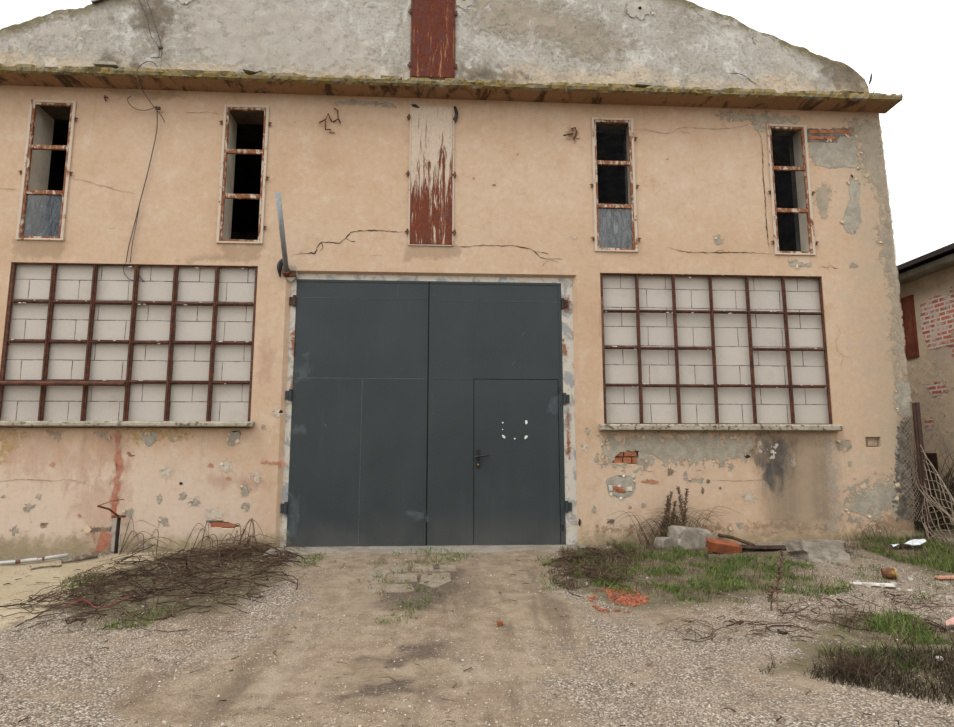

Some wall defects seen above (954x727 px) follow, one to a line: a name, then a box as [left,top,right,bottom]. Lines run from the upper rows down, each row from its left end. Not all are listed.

crack [295,230,397,255]
crack [460,245,557,264]
peeling [699,110,916,534]
rust [111,431,124,520]
peeling [579,427,779,509]
damp [766,440,829,524]